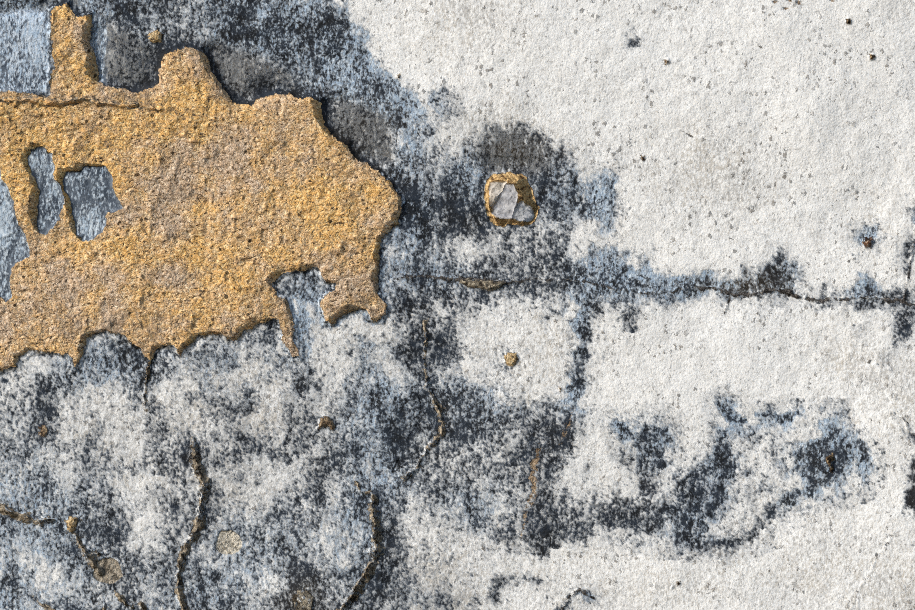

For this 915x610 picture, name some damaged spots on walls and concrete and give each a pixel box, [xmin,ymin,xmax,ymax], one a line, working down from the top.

spalling [0,3,402,375]
spalling [483,171,540,227]
leakage [849,218,887,256]
leakage [895,207,915,276]
crack [394,242,915,315]
leakage [806,270,915,349]
leakage [891,409,915,519]
crack [0,504,56,527]
crack [74,532,101,569]
crack [174,437,210,610]
crack [336,480,385,610]
leakage [466,566,551,610]